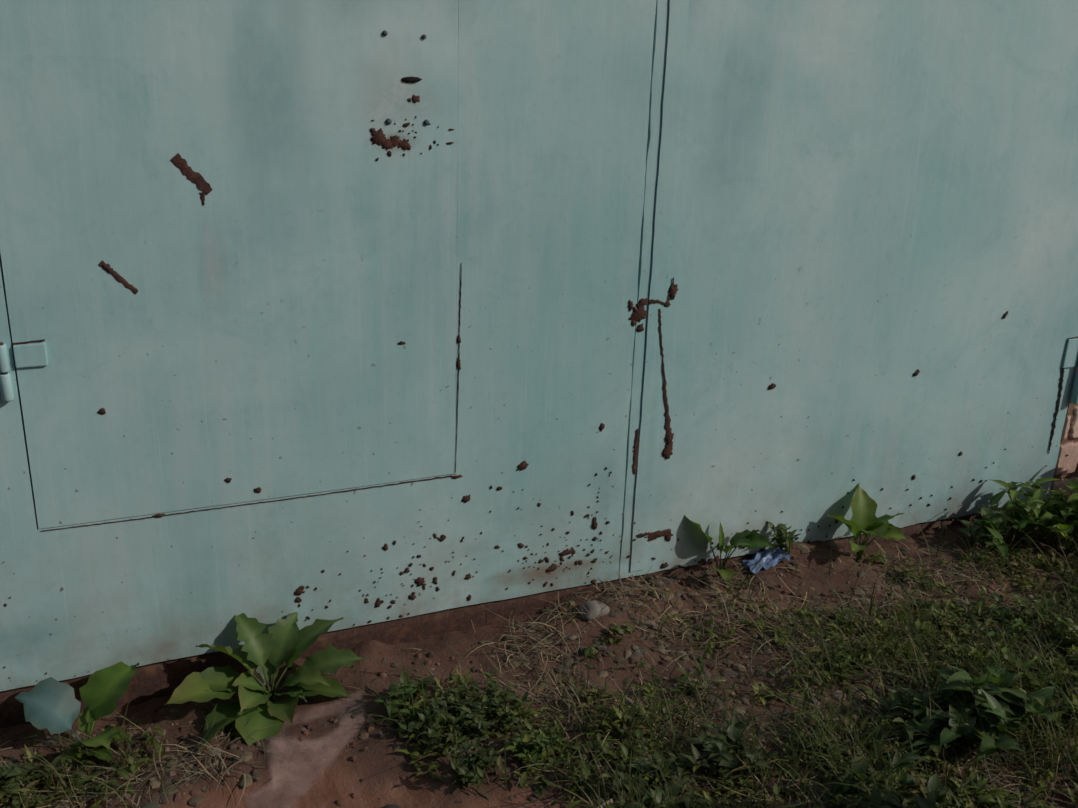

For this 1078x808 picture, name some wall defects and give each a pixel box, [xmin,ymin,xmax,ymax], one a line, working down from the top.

corrosion [370,116,439,161]
corrosion [628,278,678,460]
corrosion [635,528,674,541]